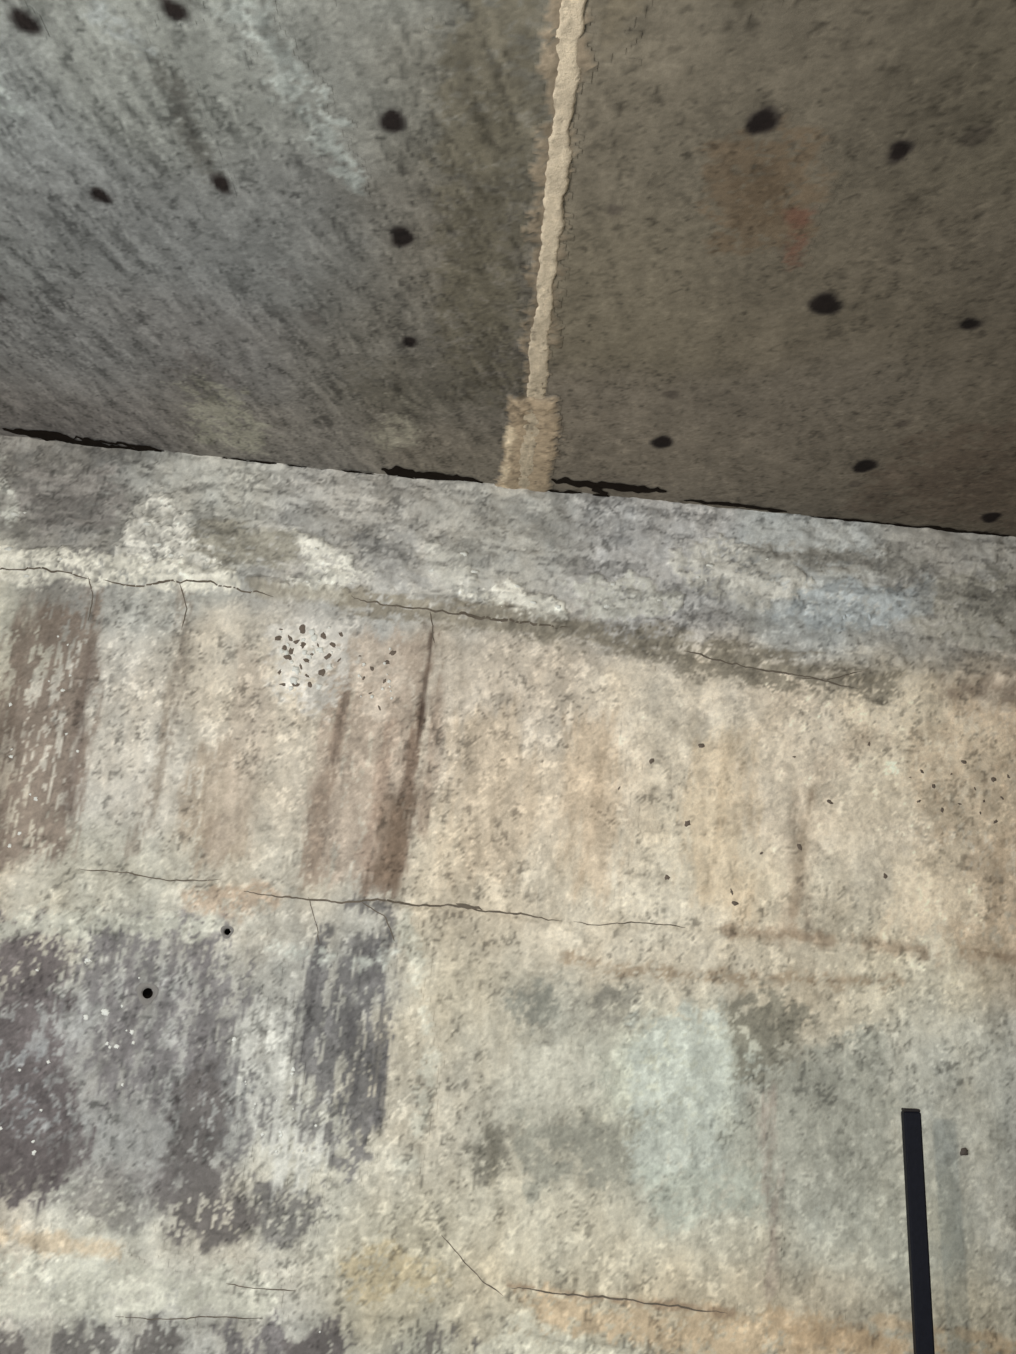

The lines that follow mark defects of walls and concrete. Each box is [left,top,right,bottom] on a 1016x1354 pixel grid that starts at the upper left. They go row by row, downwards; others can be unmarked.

water stain [0,587,113,878]
water stain [115,590,281,884]
crack [81,869,685,944]
water stain [0,888,404,1259]